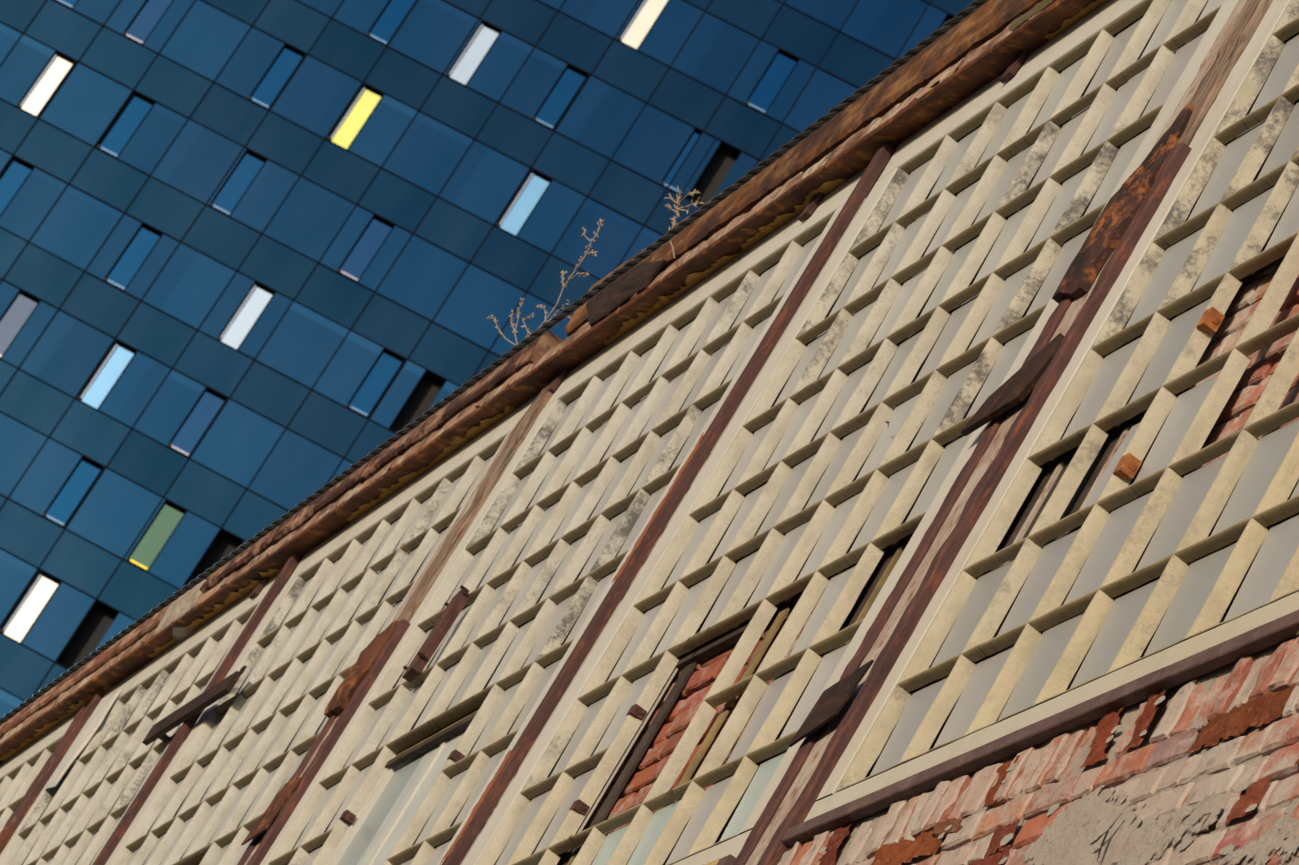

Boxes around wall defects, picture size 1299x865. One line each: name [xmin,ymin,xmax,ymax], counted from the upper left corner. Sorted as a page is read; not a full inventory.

rust [1052,103,1194,304]
rust [324,620,399,718]
spalling [1080,689,1166,768]
spalling [1184,684,1296,754]
spalling [982,755,1020,810]
spalling [817,821,854,865]
spalling [871,818,956,865]
peeling [969,775,1273,865]
peeling [1218,813,1299,865]